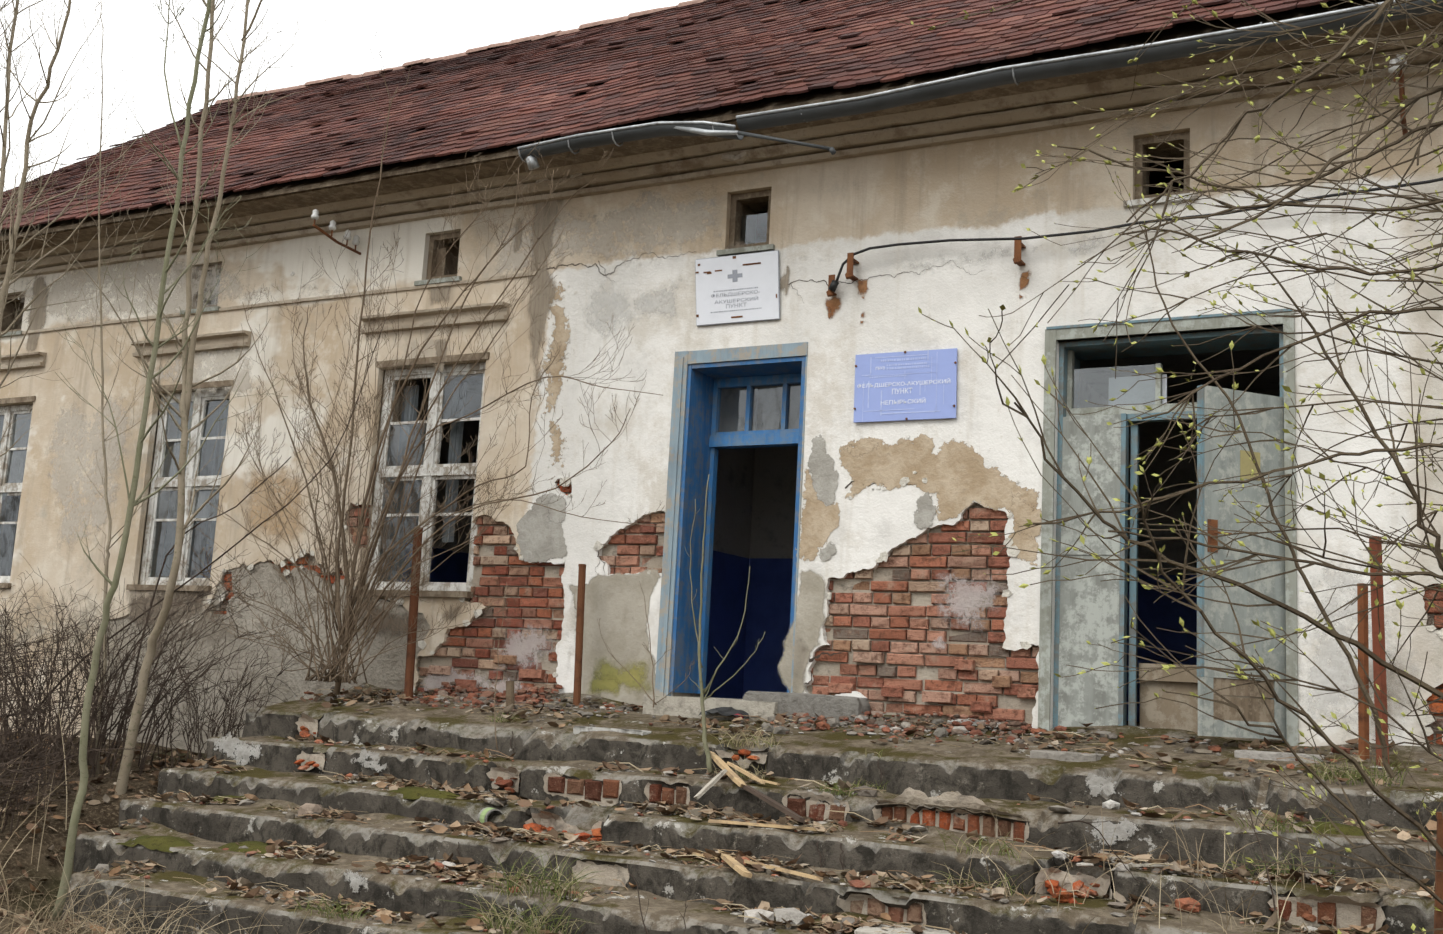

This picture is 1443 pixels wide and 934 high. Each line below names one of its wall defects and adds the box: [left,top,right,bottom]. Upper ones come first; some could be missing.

corrosion [825,296,841,318]
corrosion [857,280,868,323]
corrosion [1019,271,1029,298]
spalling [593,513,665,575]
spalling [795,433,1042,729]
spalling [1423,584,1443,639]
spalling [99,516,565,772]
spalling [1416,684,1443,746]
spalling [644,782,690,805]
spalling [782,789,850,823]
spalling [872,787,1029,843]